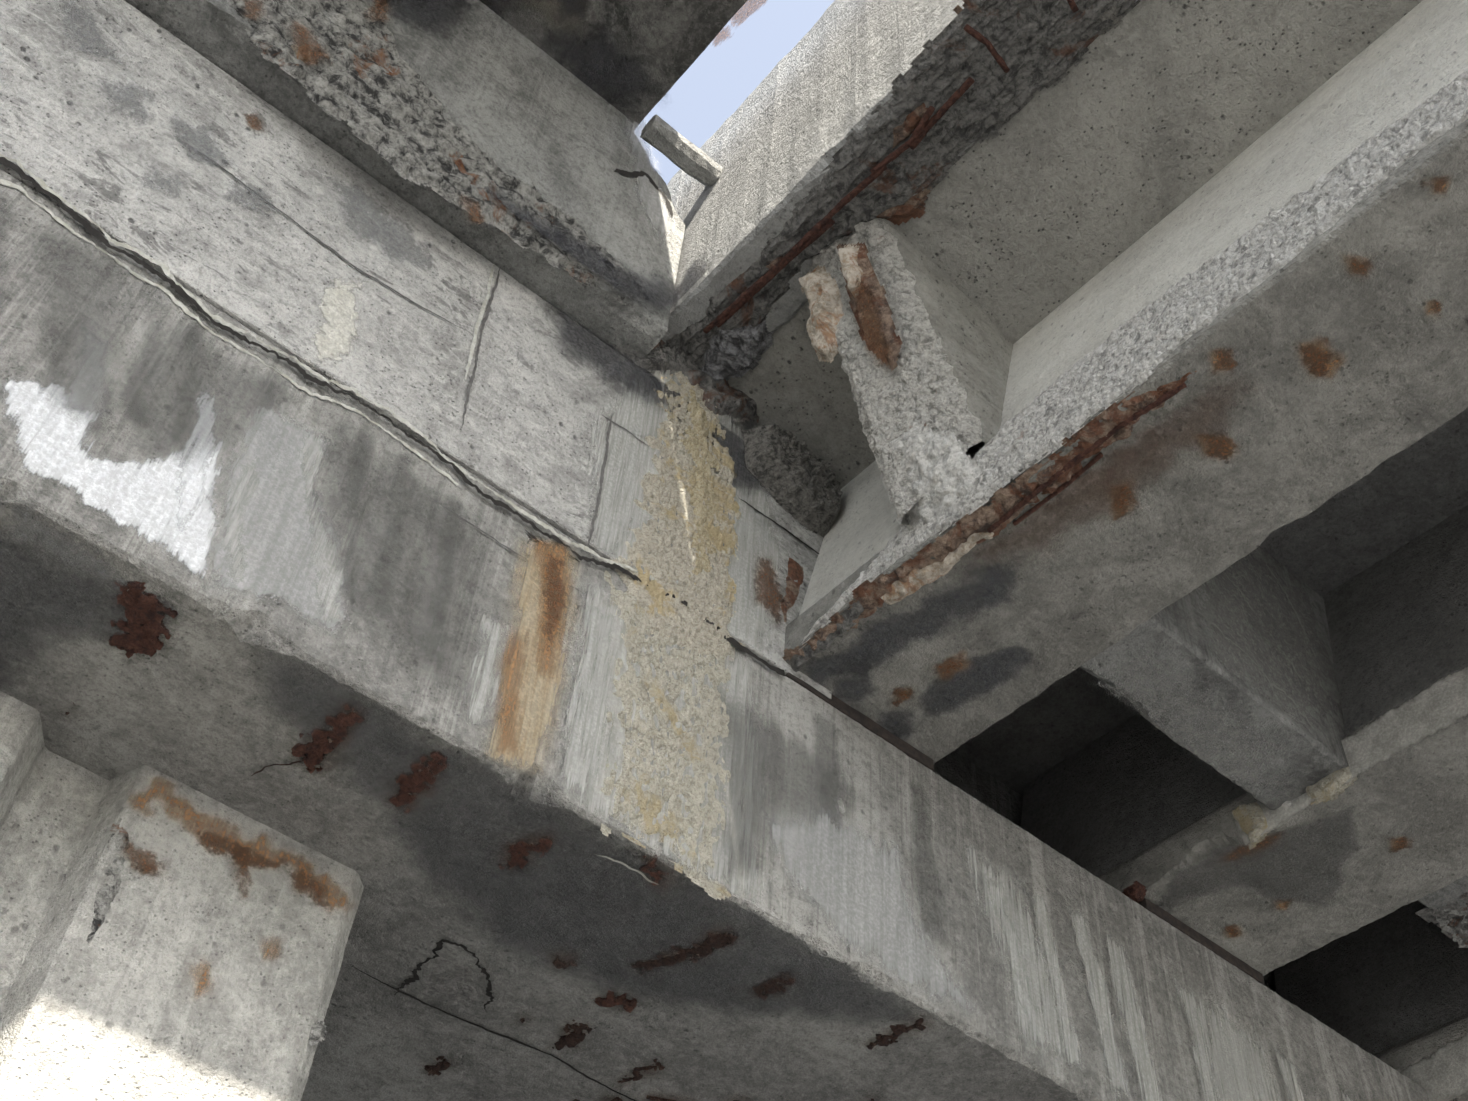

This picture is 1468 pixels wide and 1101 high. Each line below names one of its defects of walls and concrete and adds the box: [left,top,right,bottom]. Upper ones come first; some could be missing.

spalling [226,0,643,306]
damp [5,336,343,625]
crack [0,137,785,676]
rust [837,242,903,371]
spalling [609,0,1142,538]
spalling [782,69,1468,672]
rust [490,541,570,765]
damp [808,565,1013,701]
damp [881,646,1031,738]
rust [132,778,347,908]
peeling [1416,892,1468,948]
crack [352,966,636,1101]